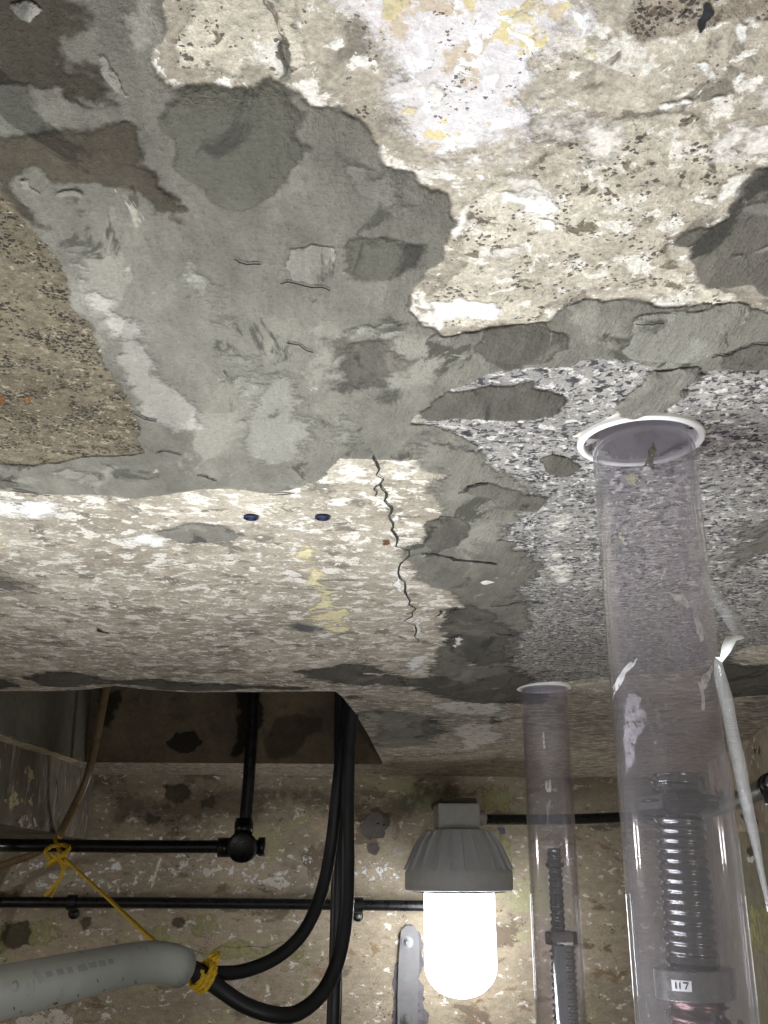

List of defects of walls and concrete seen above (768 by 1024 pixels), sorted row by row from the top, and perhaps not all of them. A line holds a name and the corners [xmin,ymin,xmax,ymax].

crack [262,0,288,76]
spalling [0,189,144,466]
crack [372,456,497,642]
spalling [417,357,768,683]
leakage [364,655,431,676]